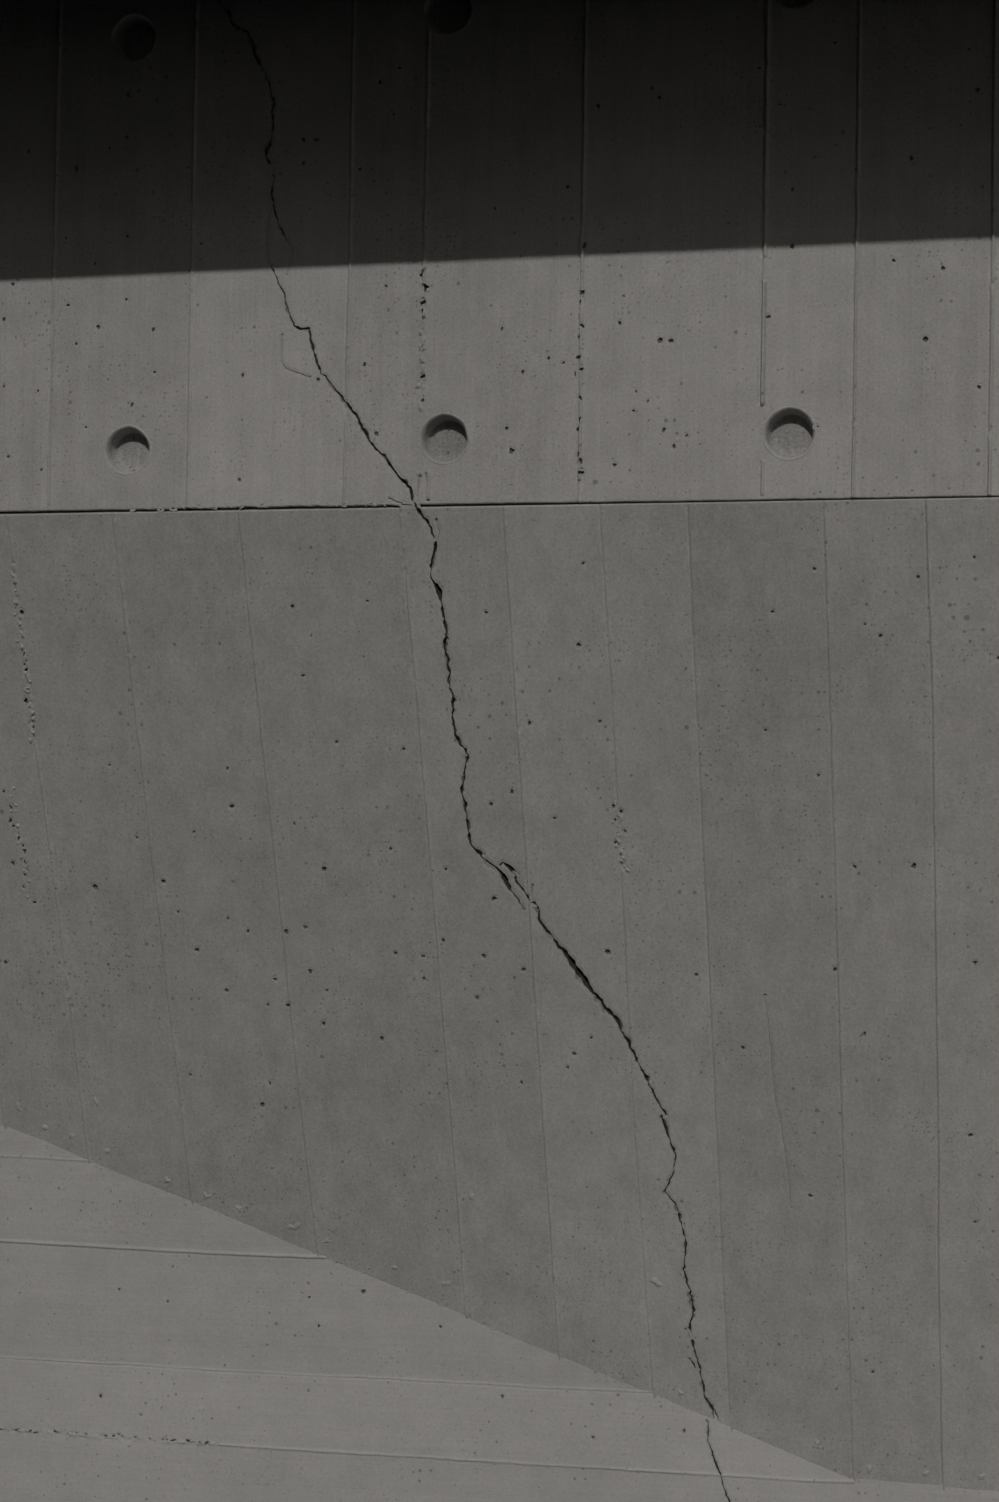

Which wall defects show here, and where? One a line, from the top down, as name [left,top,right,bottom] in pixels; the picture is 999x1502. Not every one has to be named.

crack [216,0,732,1502]